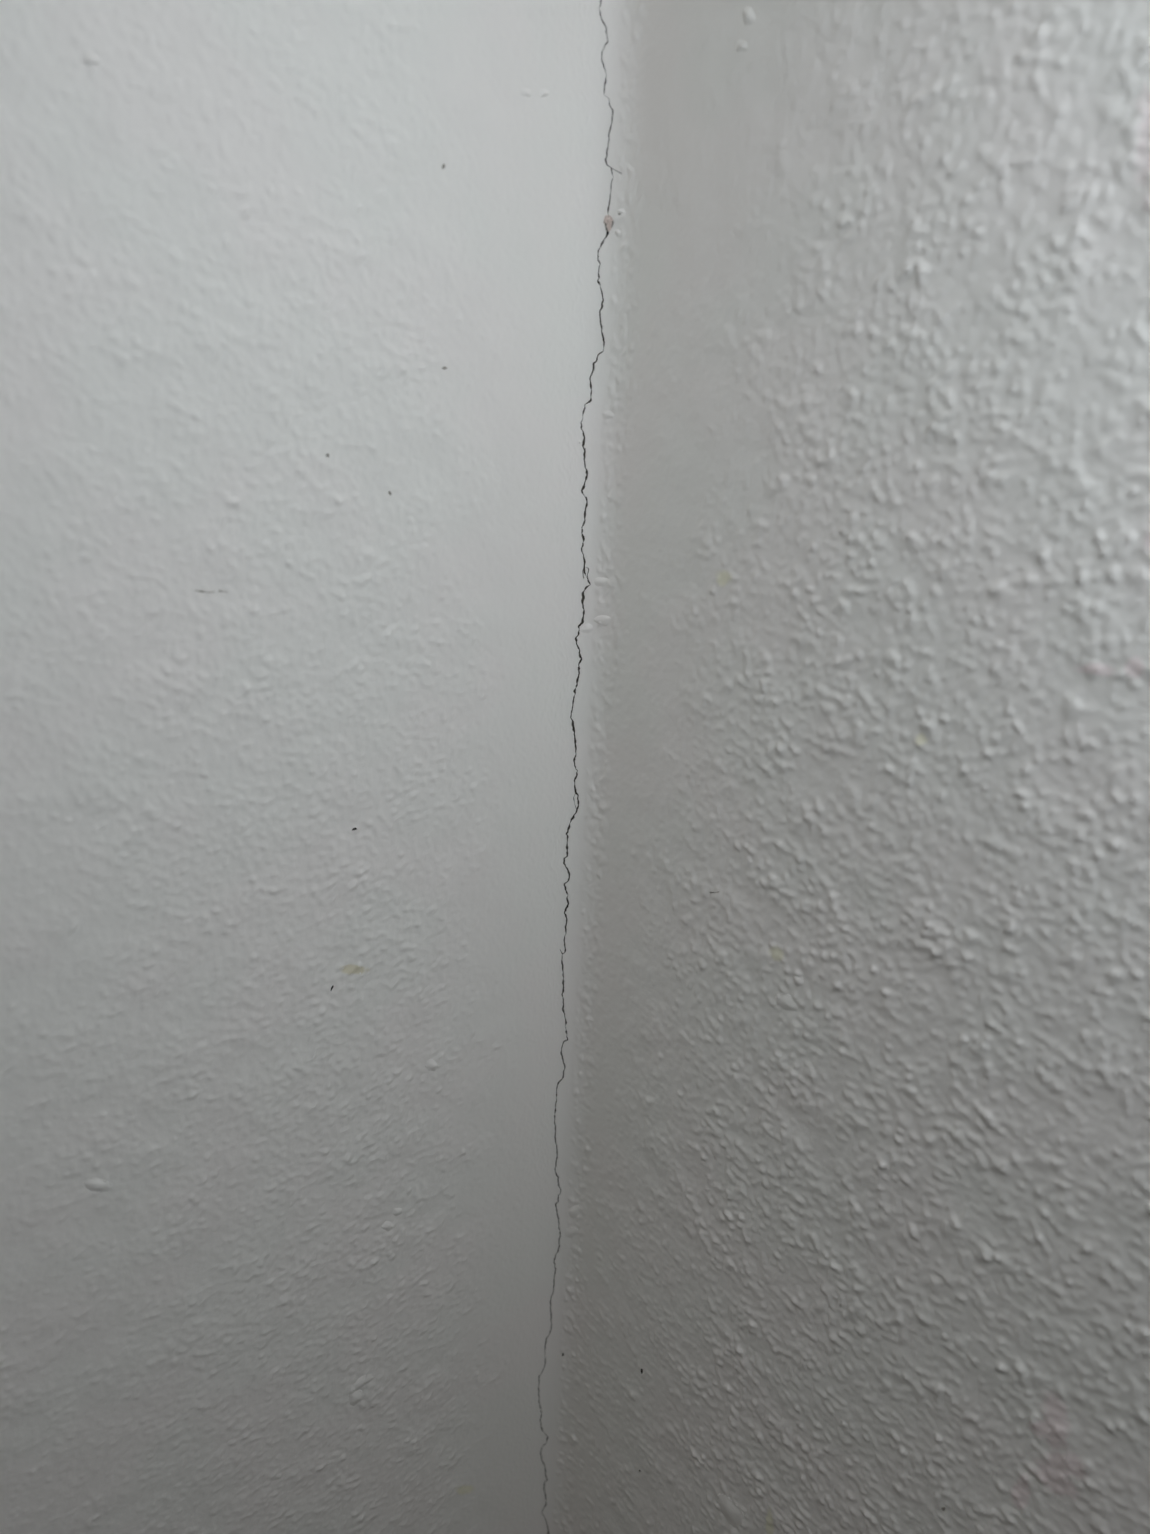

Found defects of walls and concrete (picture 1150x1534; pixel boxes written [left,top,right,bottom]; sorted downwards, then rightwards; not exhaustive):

crack [538,0,622,1534]